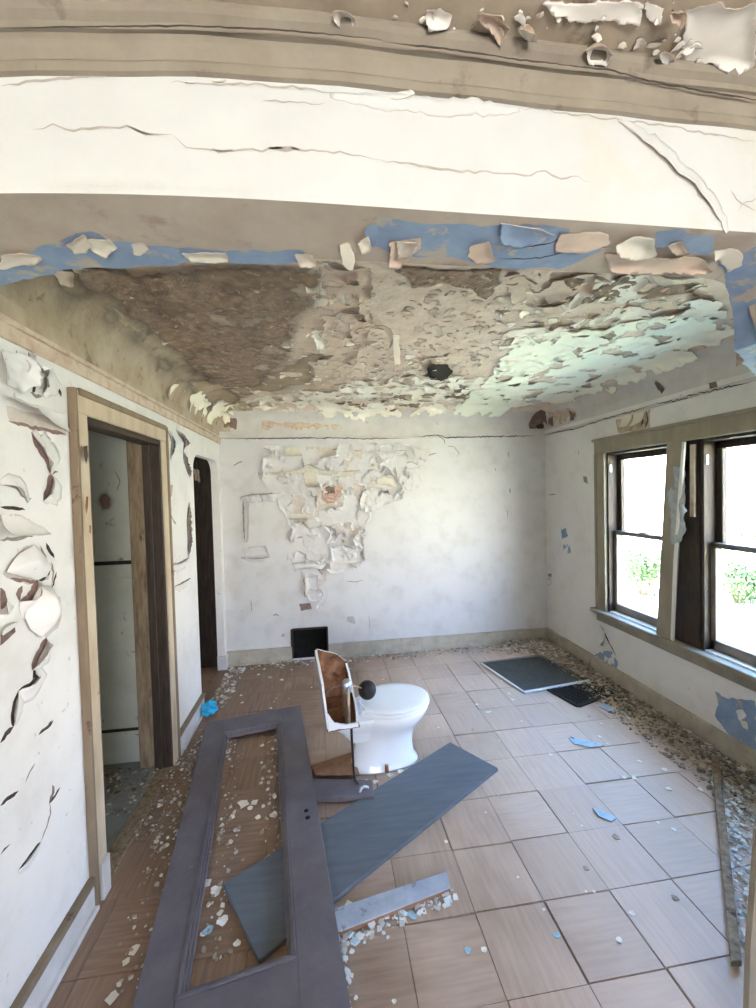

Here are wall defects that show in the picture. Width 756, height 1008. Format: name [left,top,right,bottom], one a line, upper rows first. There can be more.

crack [19,25,756,100]
peeling [419,7,456,32]
peeling [472,0,756,76]
crack [41,123,590,182]
crack [173,81,756,234]
water stain [59,269,91,296]
peeling [0,216,756,436]
water stain [188,353,323,407]
peeling [168,424,200,484]
peeling [240,442,430,611]
peeling [0,514,62,646]
peeling [715,691,756,751]